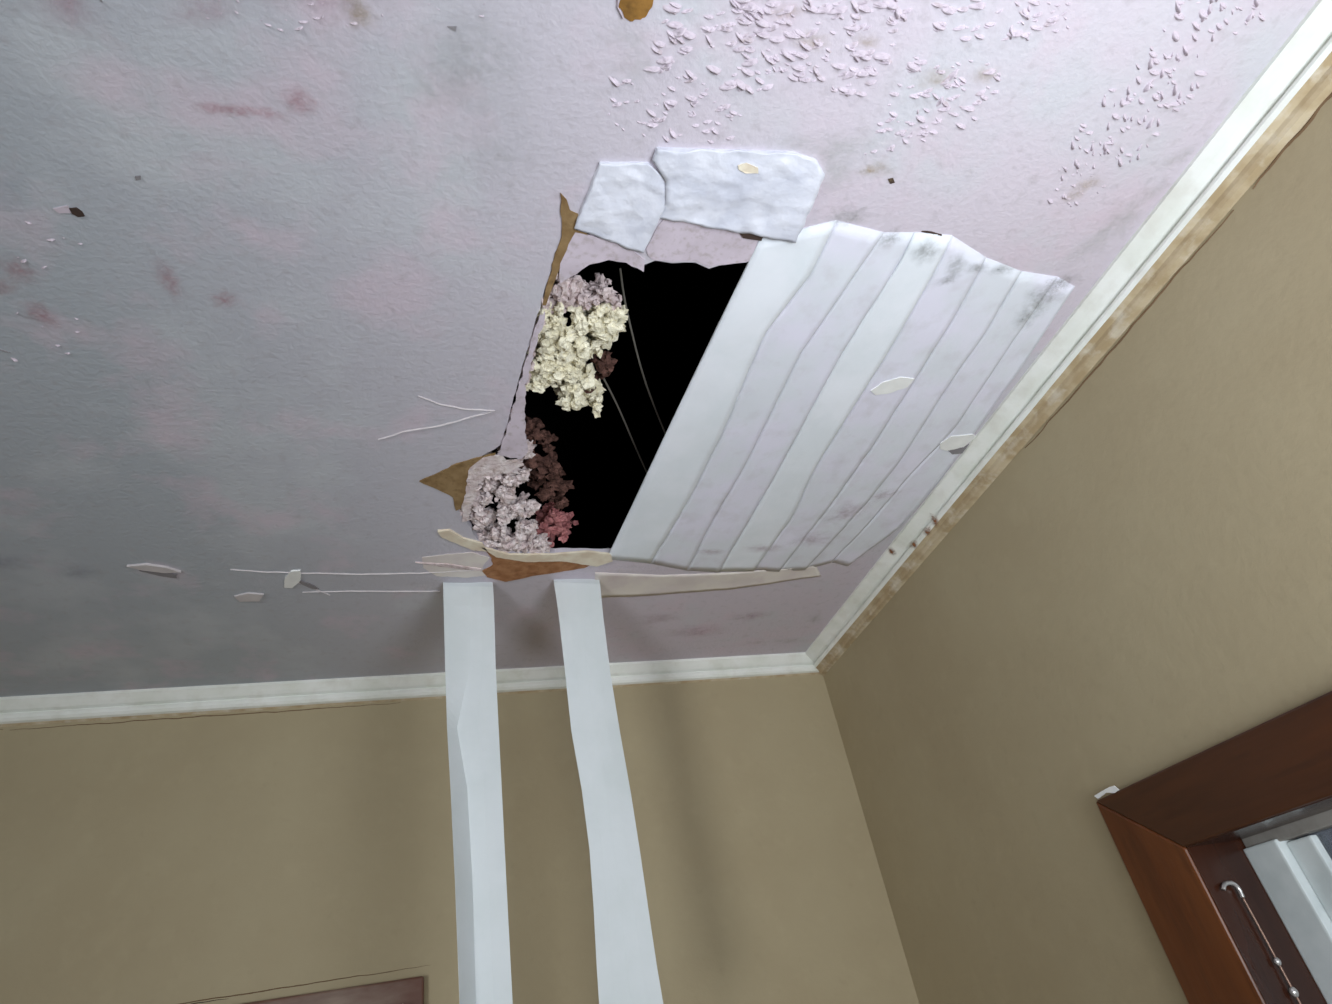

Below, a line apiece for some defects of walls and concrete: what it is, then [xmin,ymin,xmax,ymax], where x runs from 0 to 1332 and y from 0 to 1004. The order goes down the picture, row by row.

spalling [616,0,653,22]
spalling [415,193,763,582]